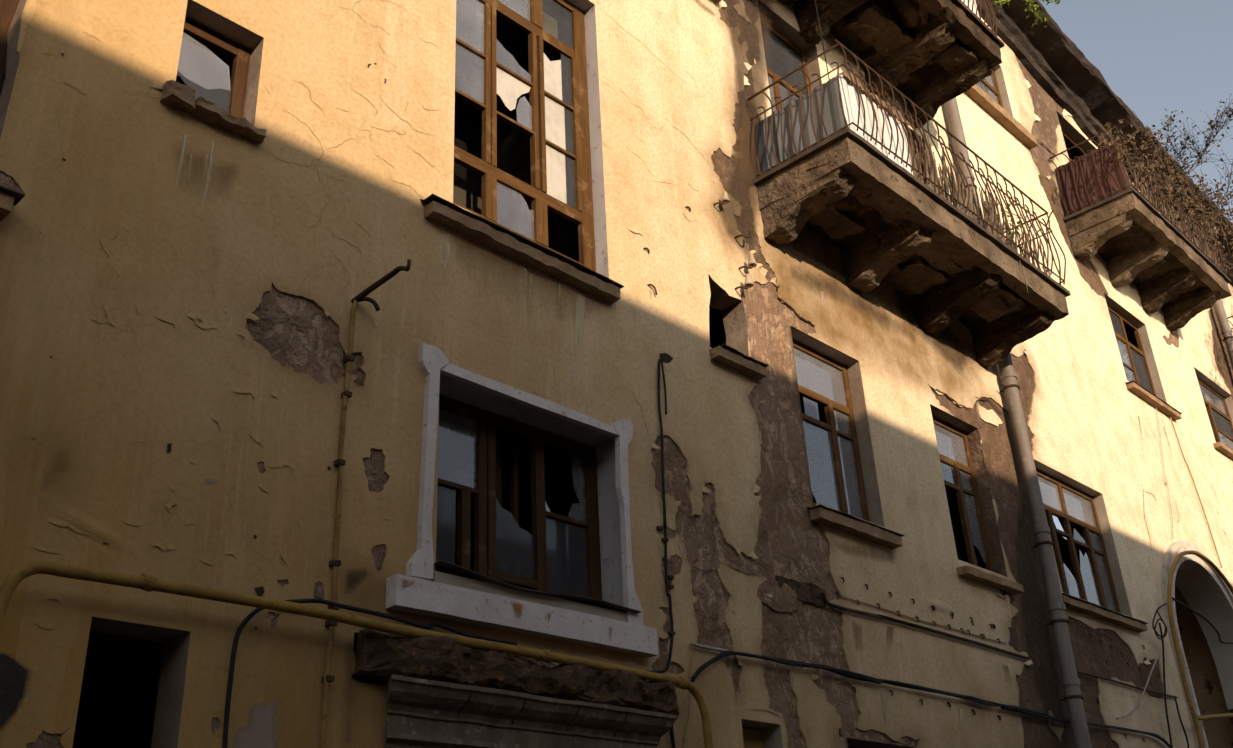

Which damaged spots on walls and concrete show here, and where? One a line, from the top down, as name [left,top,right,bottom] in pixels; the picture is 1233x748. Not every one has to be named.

crack [336,0,439,53]
crack [264,65,438,273]
spalling [1015,55,1108,297]
peeling [245,285,365,387]
spalling [651,0,919,748]
peeling [362,448,389,493]
peeling [371,545,386,573]
spalling [931,350,1075,748]
spalling [1067,617,1163,748]